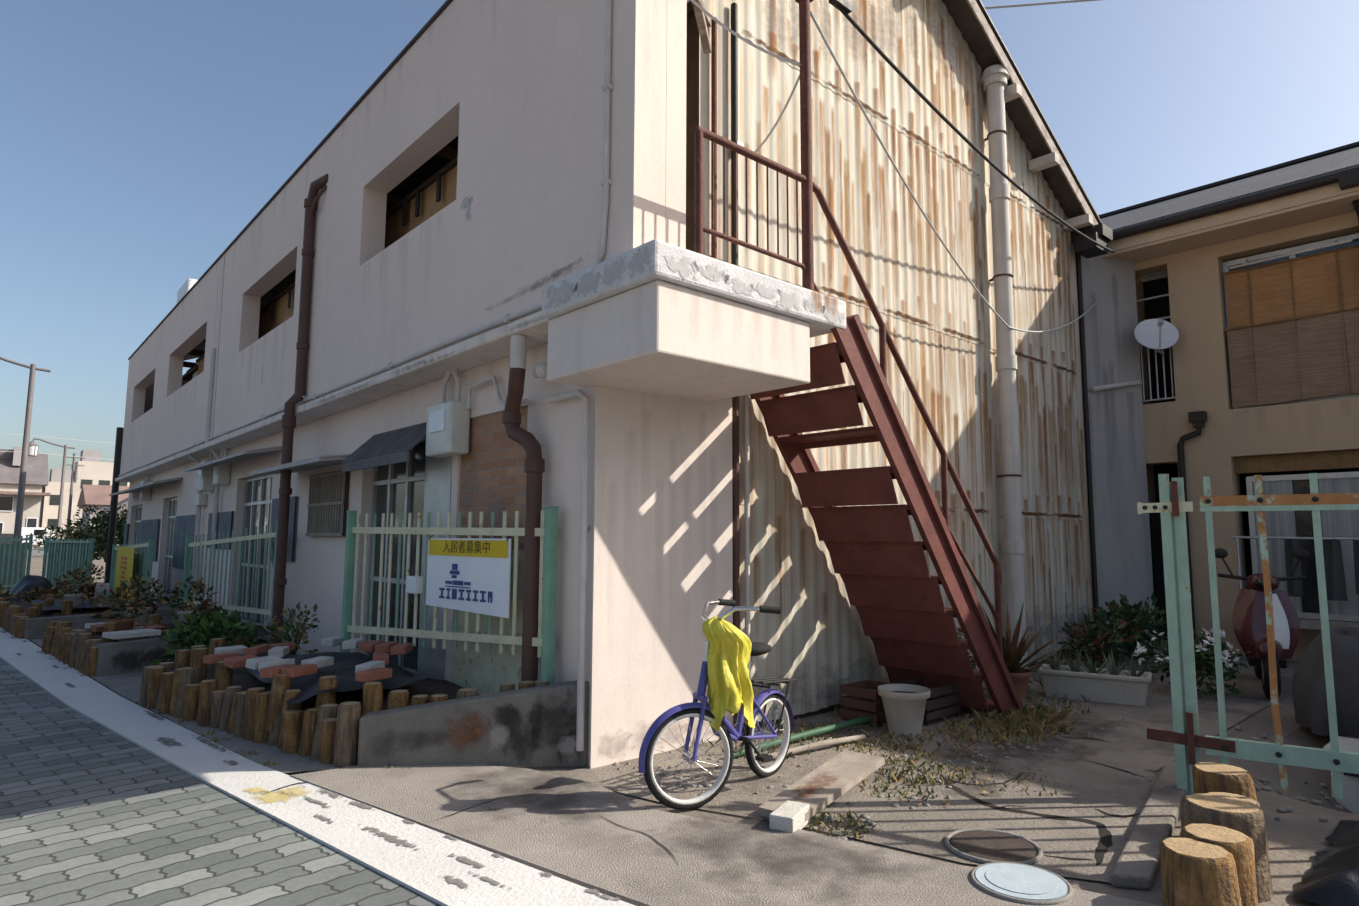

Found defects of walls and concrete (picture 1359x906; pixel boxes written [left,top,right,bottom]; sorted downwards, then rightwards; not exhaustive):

corrosion [745,0,985,299]
corrosion [815,263,991,464]
leakage [490,701,577,762]
crack [940,772,1139,866]